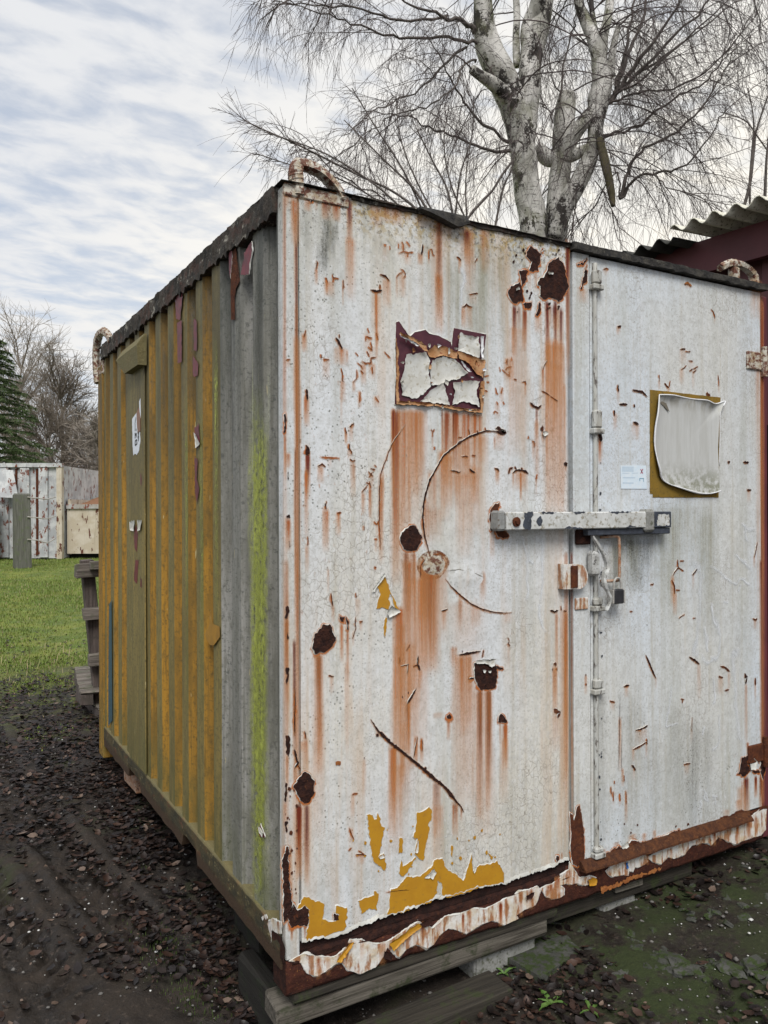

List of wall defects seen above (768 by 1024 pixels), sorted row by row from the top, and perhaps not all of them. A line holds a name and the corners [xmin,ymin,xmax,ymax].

peeling [229,241,254,279]
corrosion [507,241,588,366]
peeling [394,321,488,415]
corrosion [282,192,352,762]
corrosion [440,412,481,474]
water stain [251,450,266,858]
peeling [371,573,401,638]
corrosion [391,410,434,719]
corrosion [466,657,508,776]
corrosion [720,755,768,819]
corrosion [271,771,585,965]
peeling [261,787,767,977]